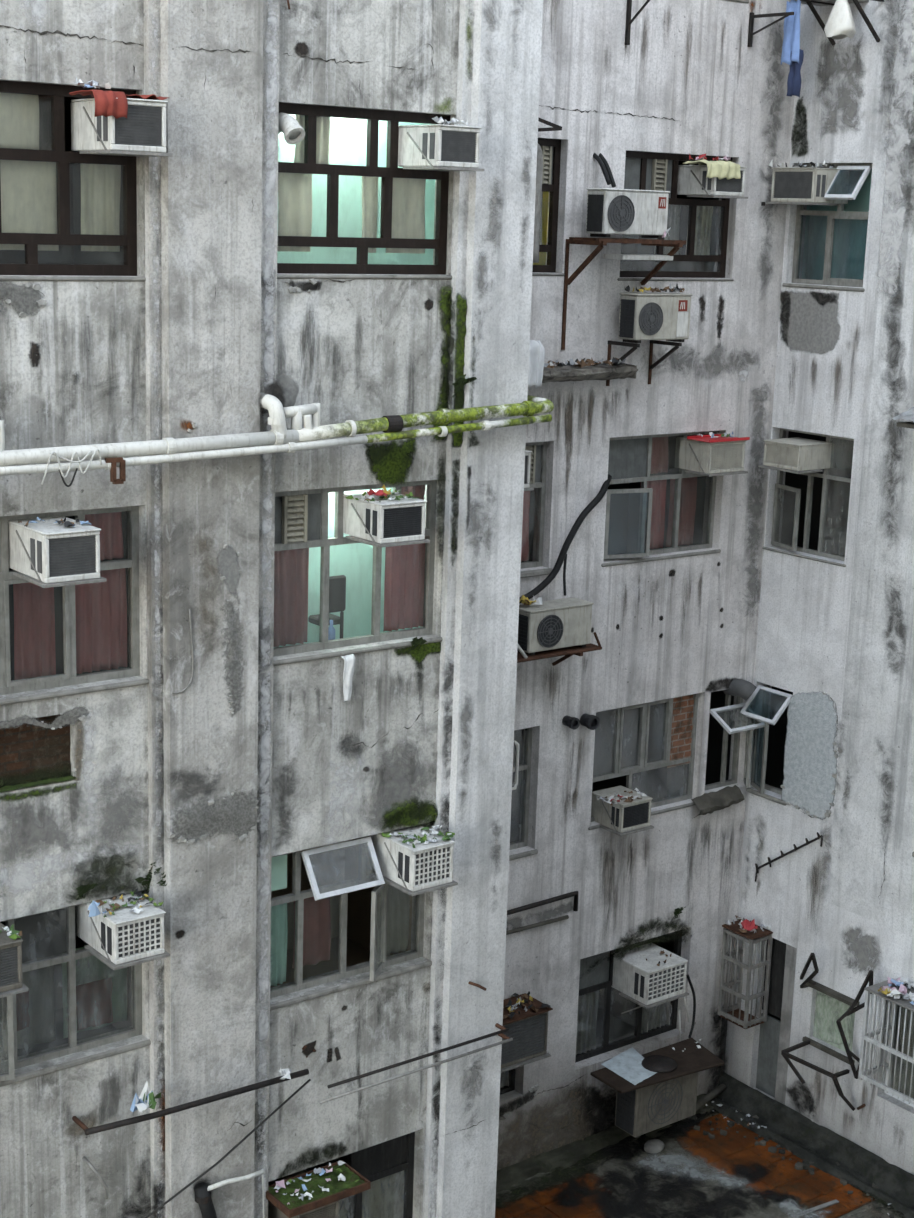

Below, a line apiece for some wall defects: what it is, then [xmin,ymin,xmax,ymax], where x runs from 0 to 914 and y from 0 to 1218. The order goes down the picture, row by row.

crack [0,25,143,72]
crack [185,46,251,89]
leakage [818,43,864,133]
leakage [763,22,808,215]
leakage [761,242,772,286]
spalling [0,281,47,317]
spalling [0,707,88,784]
peeling [781,773,837,818]
leakage [639,1155,746,1186]